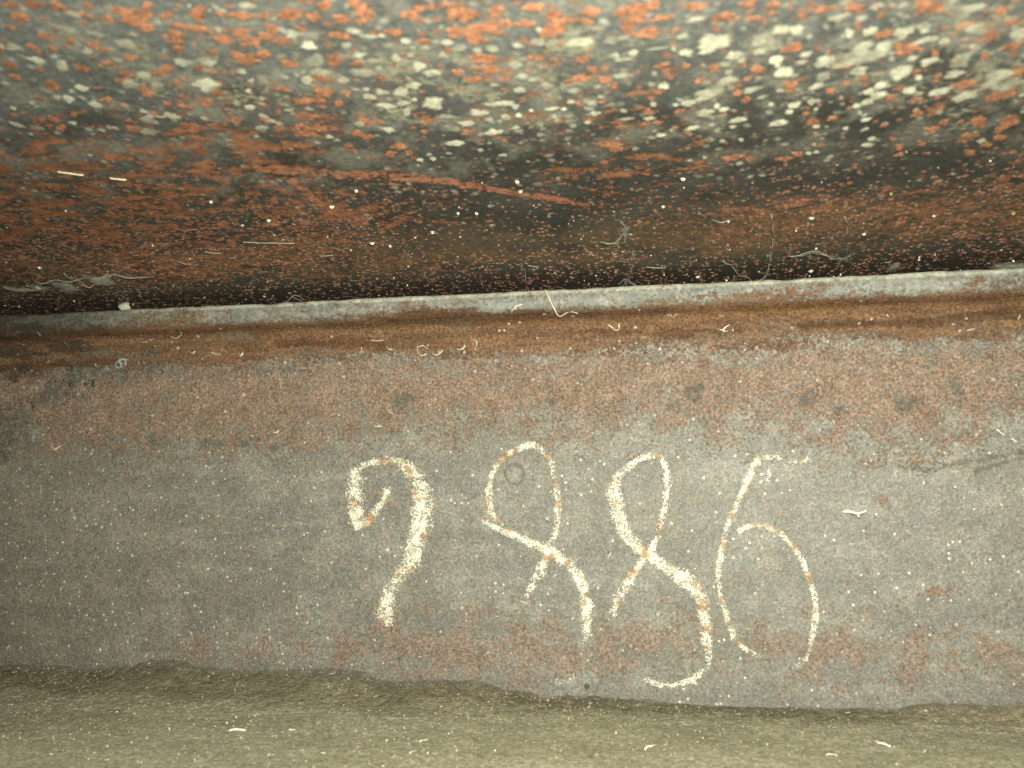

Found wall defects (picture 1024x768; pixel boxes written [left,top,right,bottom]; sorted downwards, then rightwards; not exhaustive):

corrosion [0,0,375,68]
corrosion [383,6,425,37]
corrosion [440,2,567,83]
corrosion [580,7,600,24]
corrosion [613,0,680,39]
corrosion [688,0,780,22]
corrosion [797,3,865,19]
corrosion [872,29,939,57]
corrosion [985,68,1024,101]
corrosion [910,79,1020,157]
corrosion [0,27,721,266]
corrosion [0,274,1024,481]